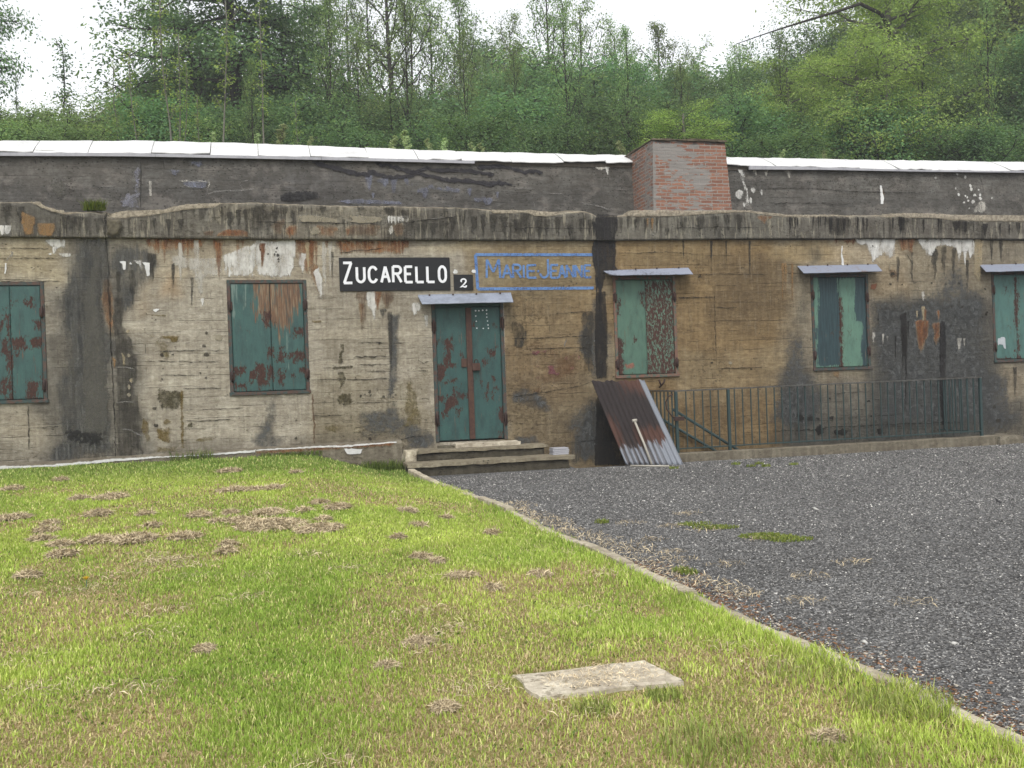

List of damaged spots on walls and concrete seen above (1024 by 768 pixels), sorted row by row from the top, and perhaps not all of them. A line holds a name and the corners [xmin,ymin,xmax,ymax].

rust [147,229,247,304]
water stain [51,214,156,461]
water stain [579,291,609,379]
rust [915,307,940,351]
water stain [873,218,1021,428]